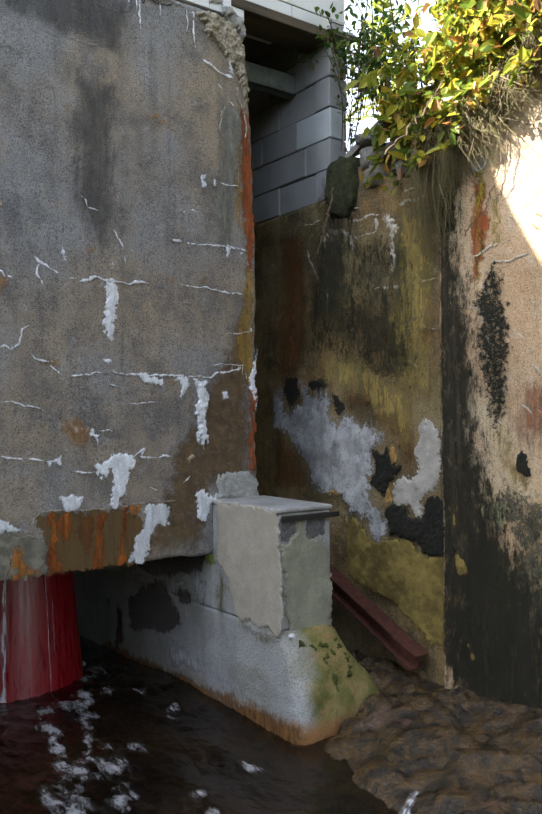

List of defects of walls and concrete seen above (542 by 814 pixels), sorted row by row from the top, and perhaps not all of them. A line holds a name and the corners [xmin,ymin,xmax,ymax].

spalling [196,0,250,103]
crack [172,239,246,257]
efflorescence [383,213,400,273]
rust [470,172,491,282]
rust [236,108,258,472]
water stain [283,377,299,409]
water stain [308,379,345,415]
rust [12,500,175,580]
water stain [74,325,258,633]
peeling [272,378,445,646]
peeling [455,554,469,575]